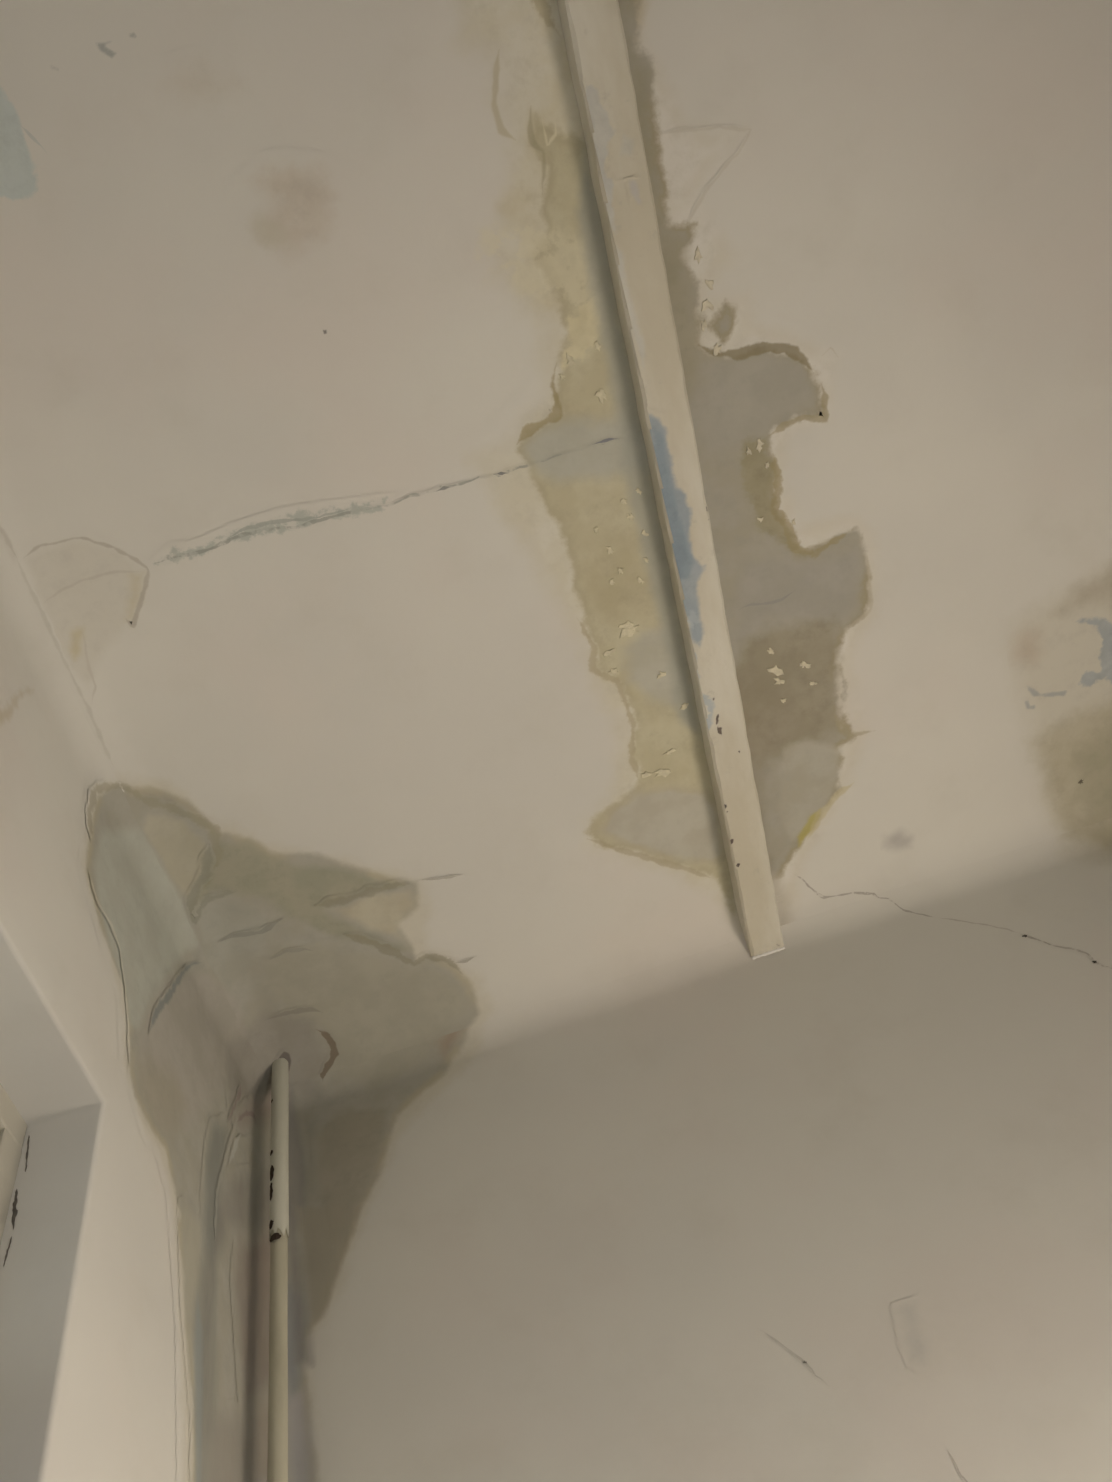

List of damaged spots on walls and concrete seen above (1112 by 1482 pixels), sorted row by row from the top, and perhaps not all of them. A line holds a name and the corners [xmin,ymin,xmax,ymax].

peeling [582,77,651,379]
crack [146,437,626,574]
leakage [430,0,745,943]
peeling [647,406,719,738]
leakage [618,0,894,926]
leakage [990,548,1112,875]
crack [790,872,1112,969]
leakage [76,764,502,1482]